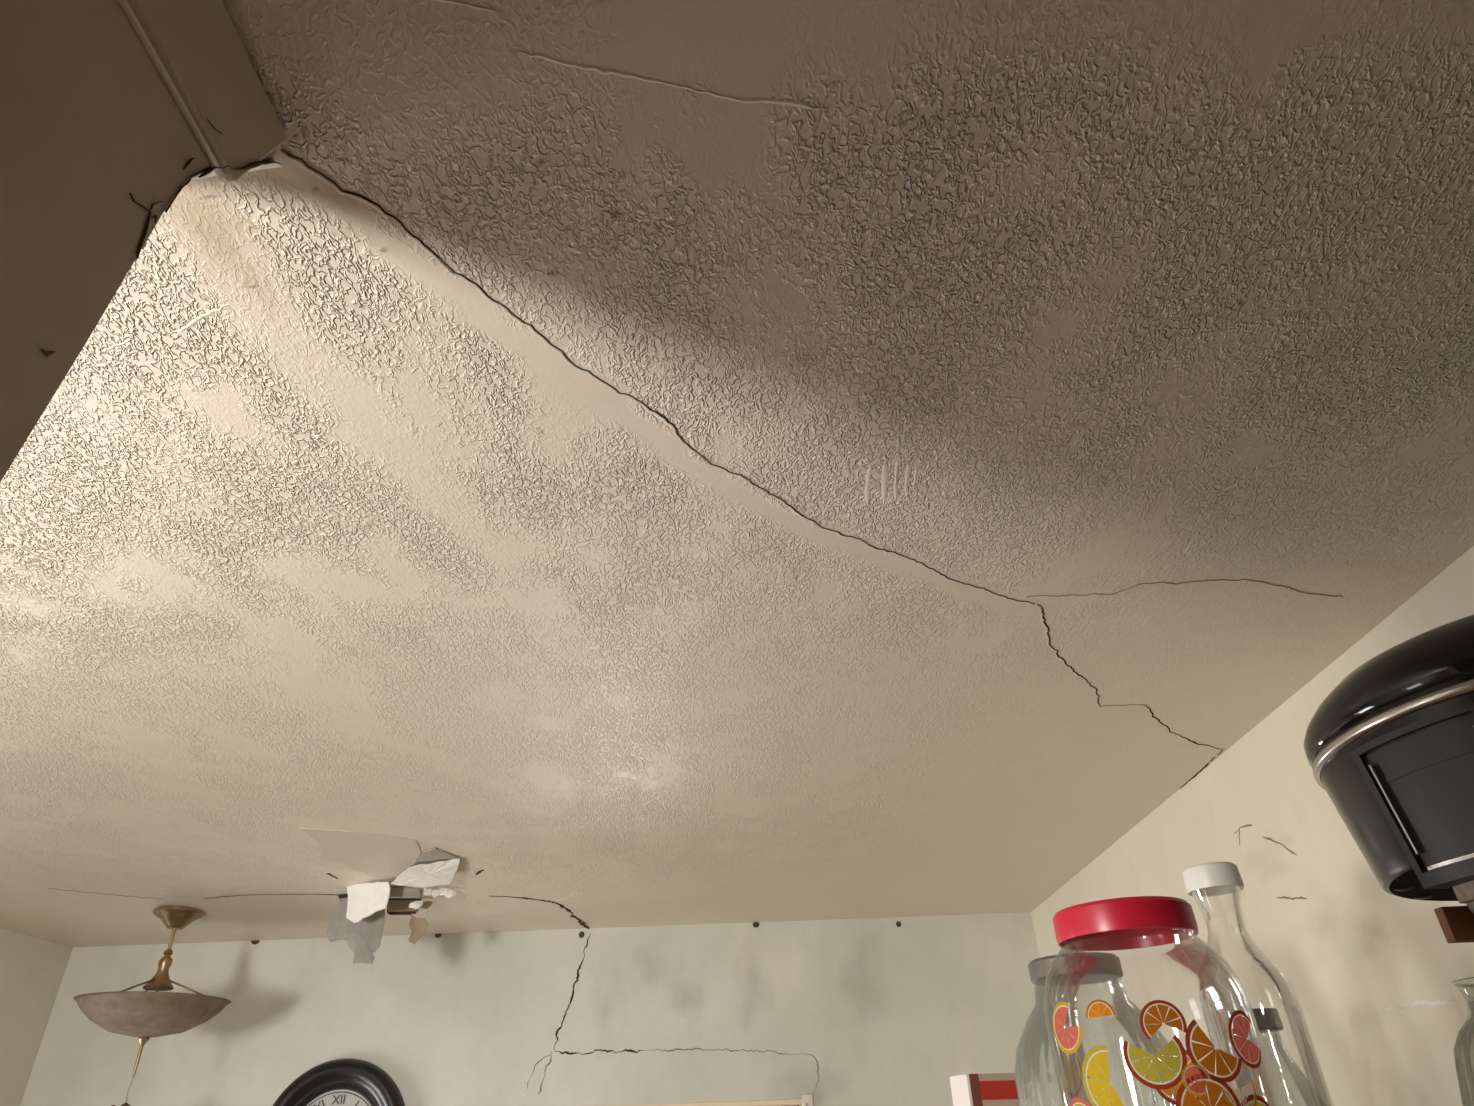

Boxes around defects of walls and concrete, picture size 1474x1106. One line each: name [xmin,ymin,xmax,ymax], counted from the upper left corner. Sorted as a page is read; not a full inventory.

crack [129,119,1343,789]
peeling [300,828,462,964]
crack [476,870,819,1093]